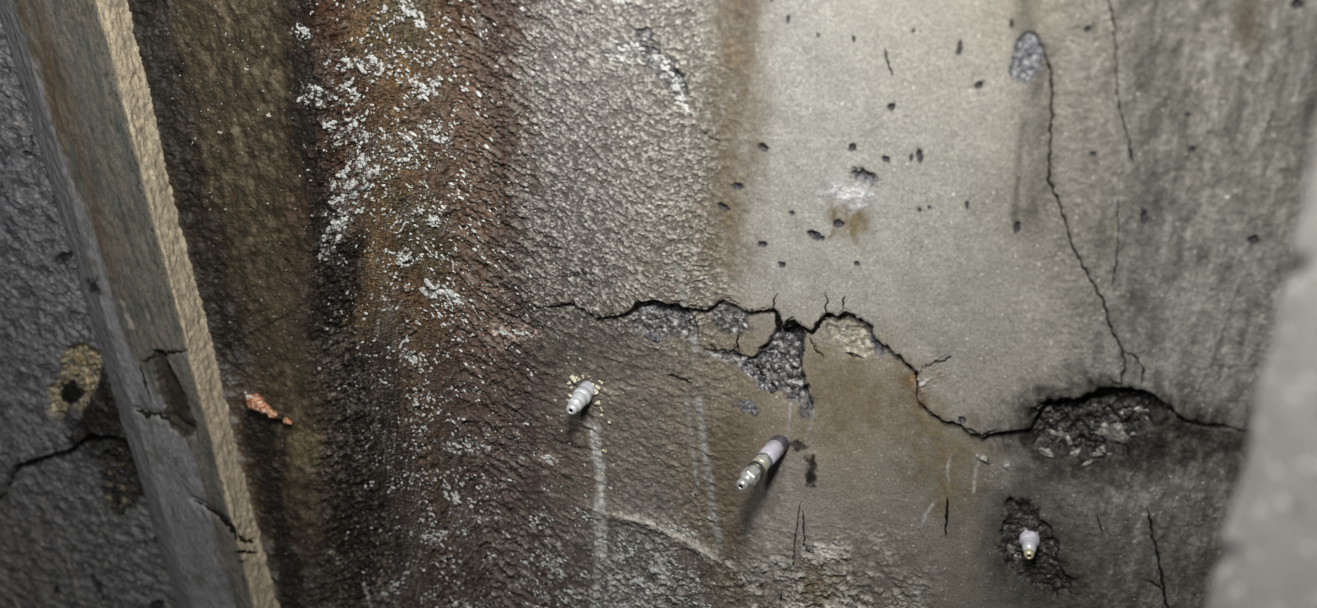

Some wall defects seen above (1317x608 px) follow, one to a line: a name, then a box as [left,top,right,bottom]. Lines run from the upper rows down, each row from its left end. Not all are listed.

crack [1107,0,1133,163]
crack [0,428,97,497]
spalling [47,342,103,419]
damp [287,0,452,599]
damp [388,242,474,306]
spalling [629,301,813,416]
crack [522,241,998,436]
spalling [975,453,1010,471]
spalling [1032,387,1163,467]
crack [1034,32,1251,433]
spalling [999,497,1076,595]
crack [1146,506,1170,608]